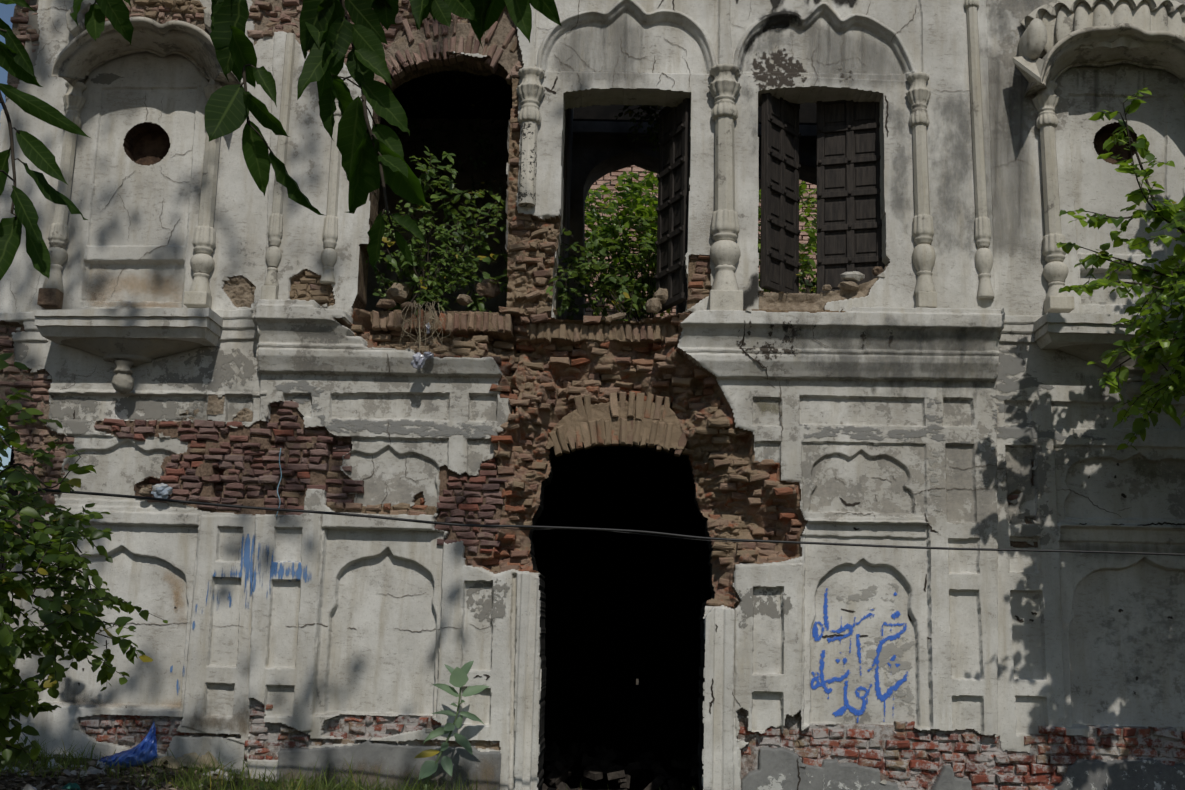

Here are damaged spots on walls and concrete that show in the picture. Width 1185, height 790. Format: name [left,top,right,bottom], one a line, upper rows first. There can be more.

spalling [247,0,310,53]
spalling [380,0,470,51]
water stain [739,0,883,95]
spalling [503,6,561,318]
spalling [222,275,256,308]
spalling [290,269,335,307]
spalling [0,320,508,558]
peeling [735,585,792,629]
spalling [72,698,501,760]
spalling [736,636,1185,790]